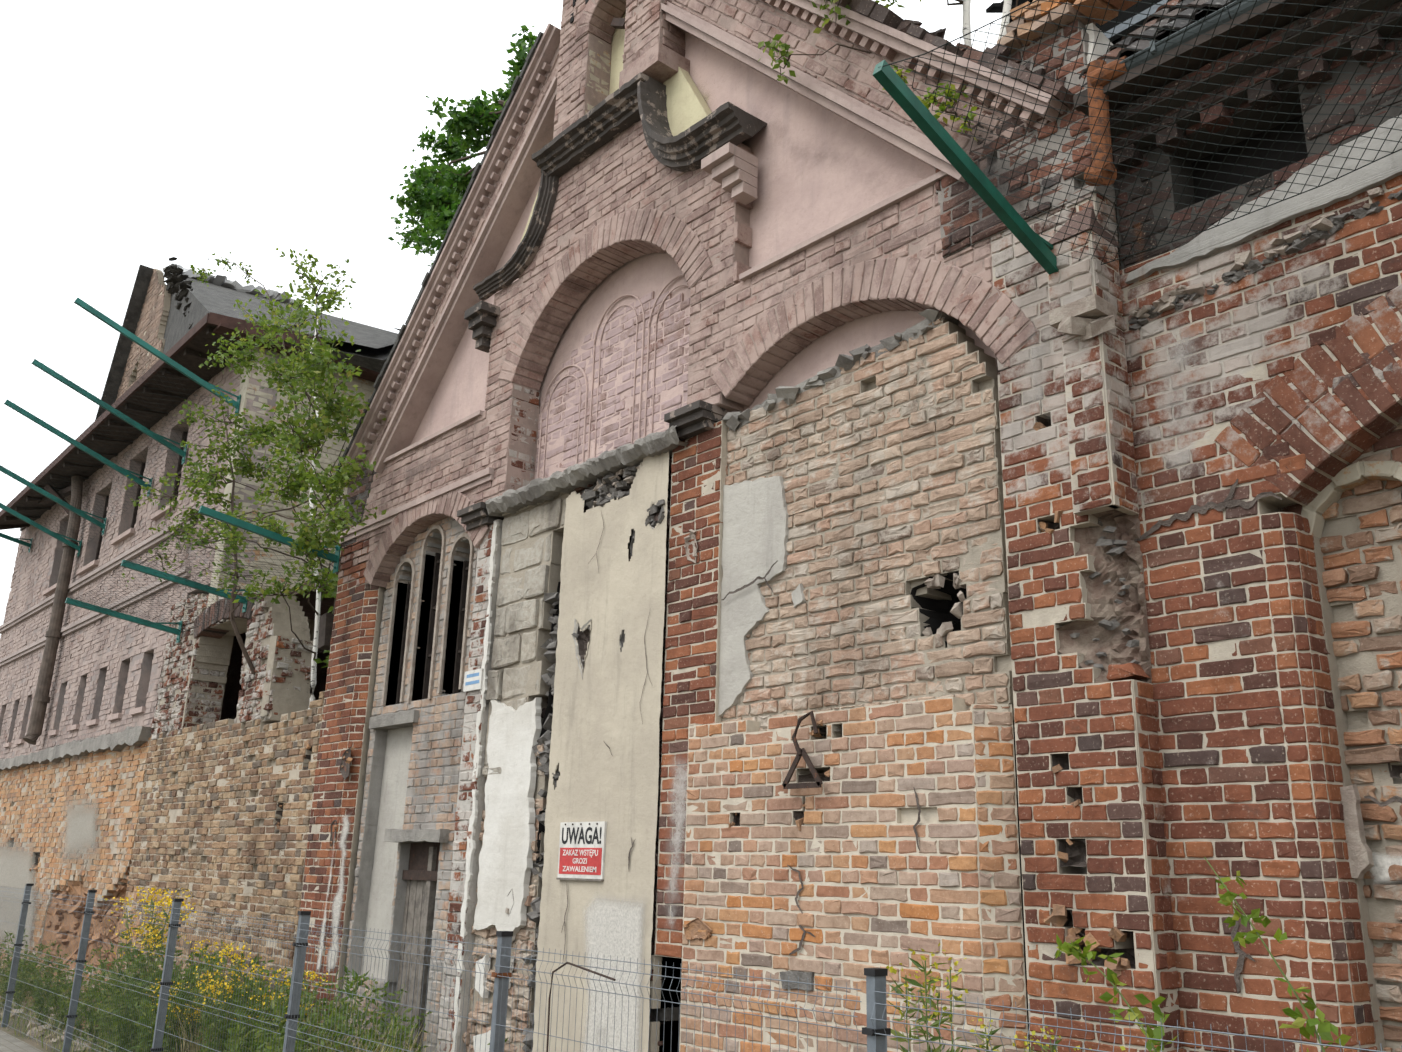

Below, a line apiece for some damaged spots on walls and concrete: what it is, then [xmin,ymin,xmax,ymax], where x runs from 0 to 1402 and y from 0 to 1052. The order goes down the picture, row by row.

spalling [1128,187,1402,330]
spalling [581,463,643,509]
peeling [718,476,790,717]
peeling [791,583,806,608]
spalling [922,572,966,638]
spalling [1039,509,1153,684]
spalling [571,619,592,680]
peeling [473,697,560,989]
peeling [475,954,491,998]
peeling [473,1030,491,1052]